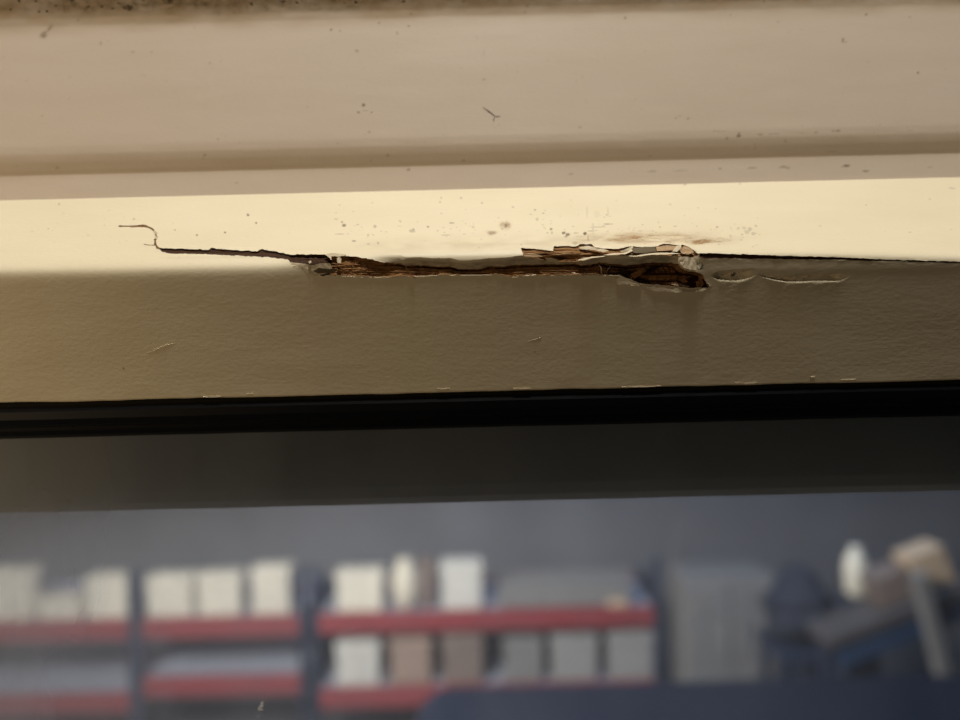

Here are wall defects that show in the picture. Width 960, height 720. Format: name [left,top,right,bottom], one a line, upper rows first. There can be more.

crack [119,224,960,293]
peeling [521,244,700,262]